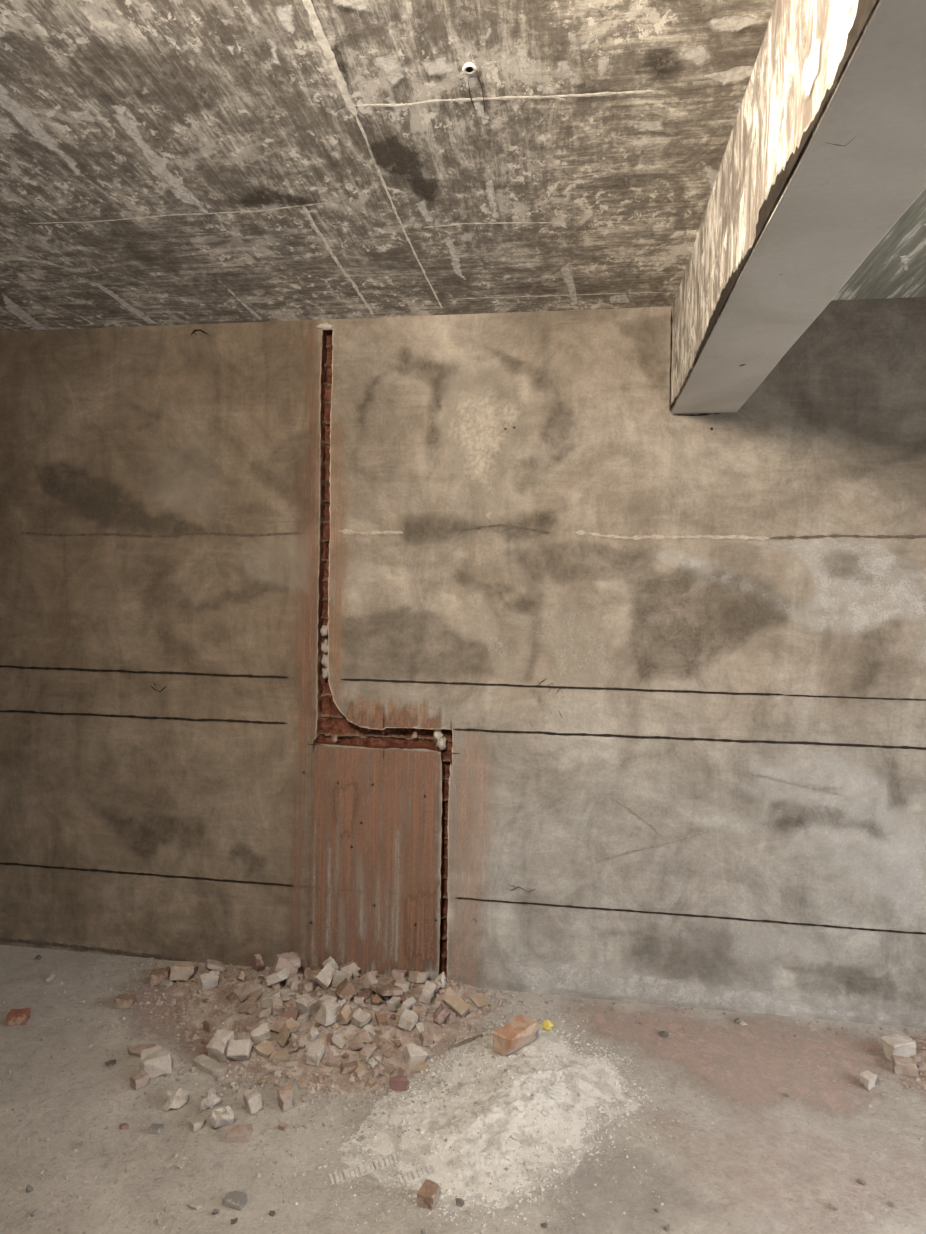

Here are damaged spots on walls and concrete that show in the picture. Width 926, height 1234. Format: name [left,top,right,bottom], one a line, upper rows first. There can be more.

peeling [563,25,592,50]
peeling [517,49,581,94]
peeling [598,56,609,75]
peeling [641,45,753,84]
peeling [472,102,490,125]
peeling [633,121,664,131]
peeling [670,0,877,410]